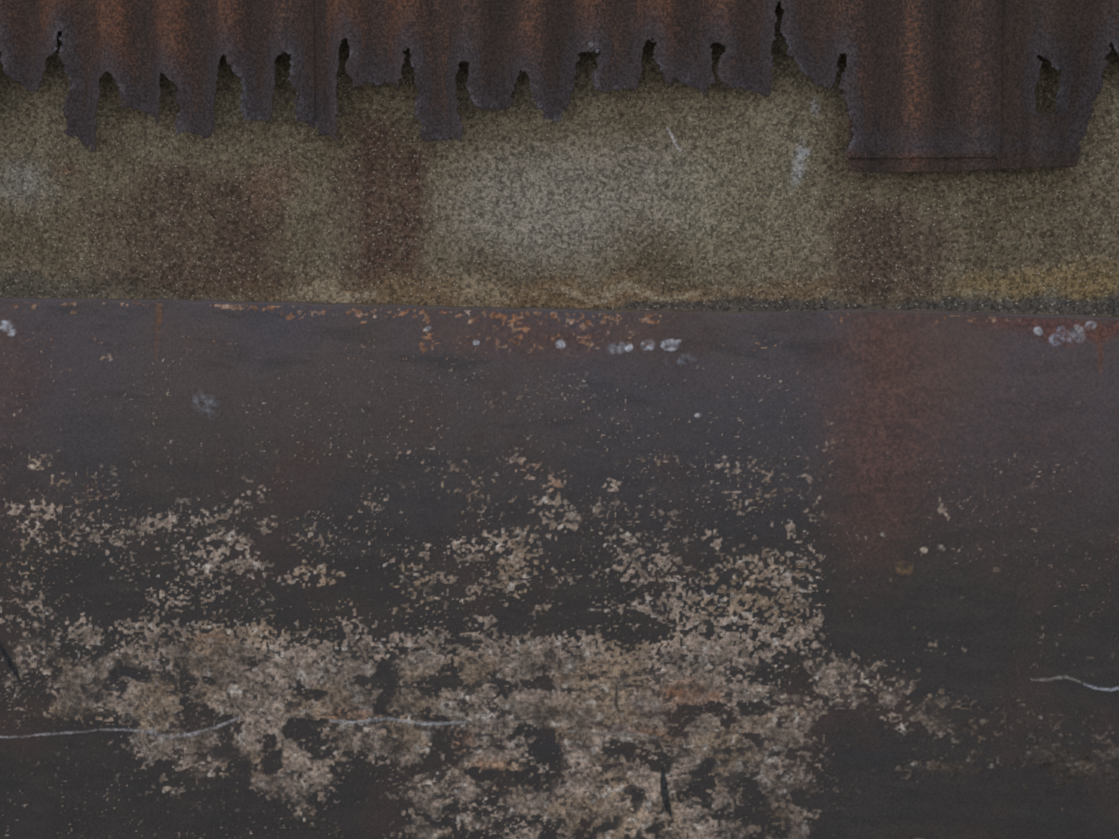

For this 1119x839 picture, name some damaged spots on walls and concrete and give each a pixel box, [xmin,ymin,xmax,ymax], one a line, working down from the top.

water stain [0,89,967,308]
water stain [0,318,18,337]
efflorescence [554,338,567,351]
efflorescence [603,338,699,367]
peeling [0,304,1038,839]
crack [1029,674,1119,692]
crack [0,715,241,741]